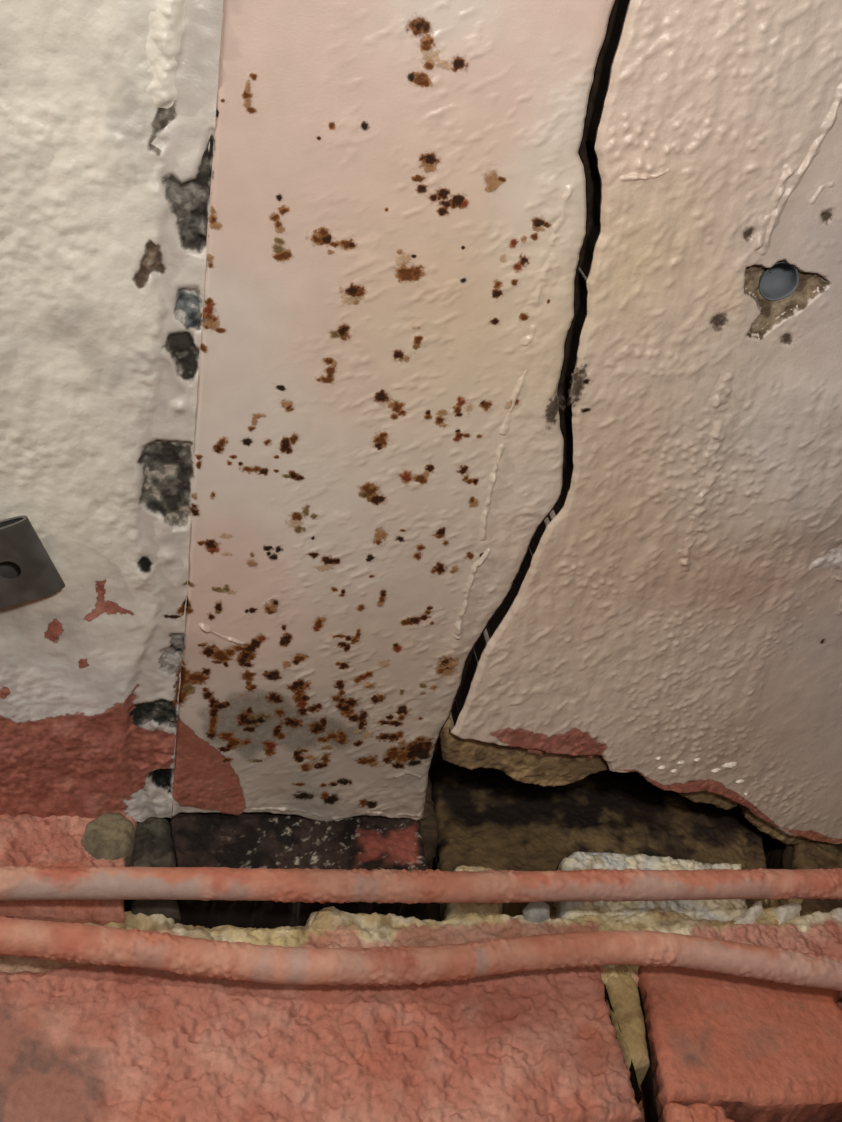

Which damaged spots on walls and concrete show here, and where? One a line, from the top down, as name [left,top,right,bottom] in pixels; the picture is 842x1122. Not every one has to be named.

corrosion [407,18,468,87]
flaking render [164,135,215,251]
corrosion [412,153,469,216]
peeling [744,82,842,344]
flaking render [133,240,165,288]
corrosion [492,218,551,298]
flaking render [165,288,203,379]
crack [430,0,630,768]
flaking render [138,440,193,526]
corrosion [195,413,304,481]
corrosion [174,625,433,804]
flaking render [439,716,609,787]